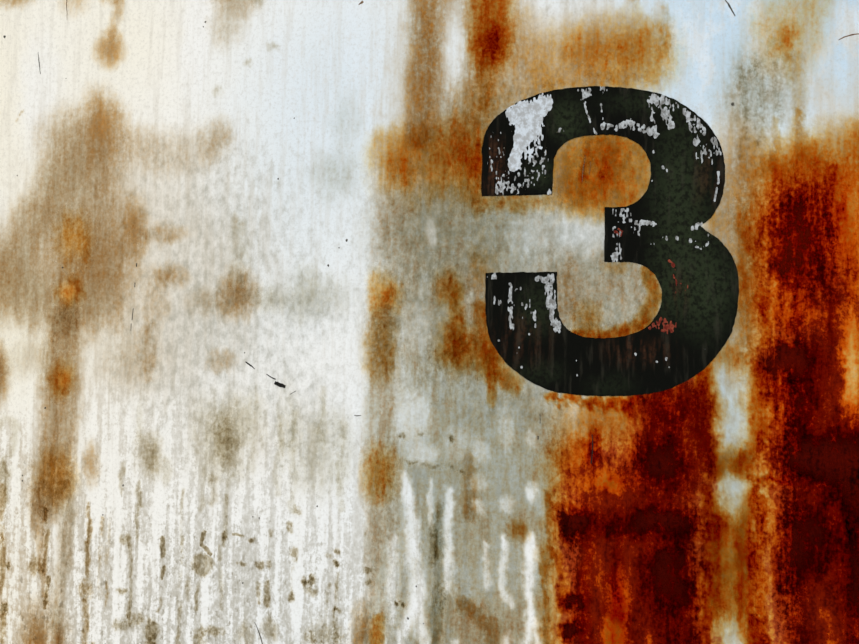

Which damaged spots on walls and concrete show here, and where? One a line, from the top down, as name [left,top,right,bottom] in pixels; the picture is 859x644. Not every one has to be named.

rust [473,0,506,61]
rust [430,131,481,178]
peeling [489,93,553,195]
rust [563,138,648,207]
peeling [577,86,721,202]
peeling [611,208,657,262]
peeling [662,222,709,250]
peeling [493,283,536,335]
peeling [535,274,561,333]
peeling [648,317,676,334]
rust [540,155,859,644]